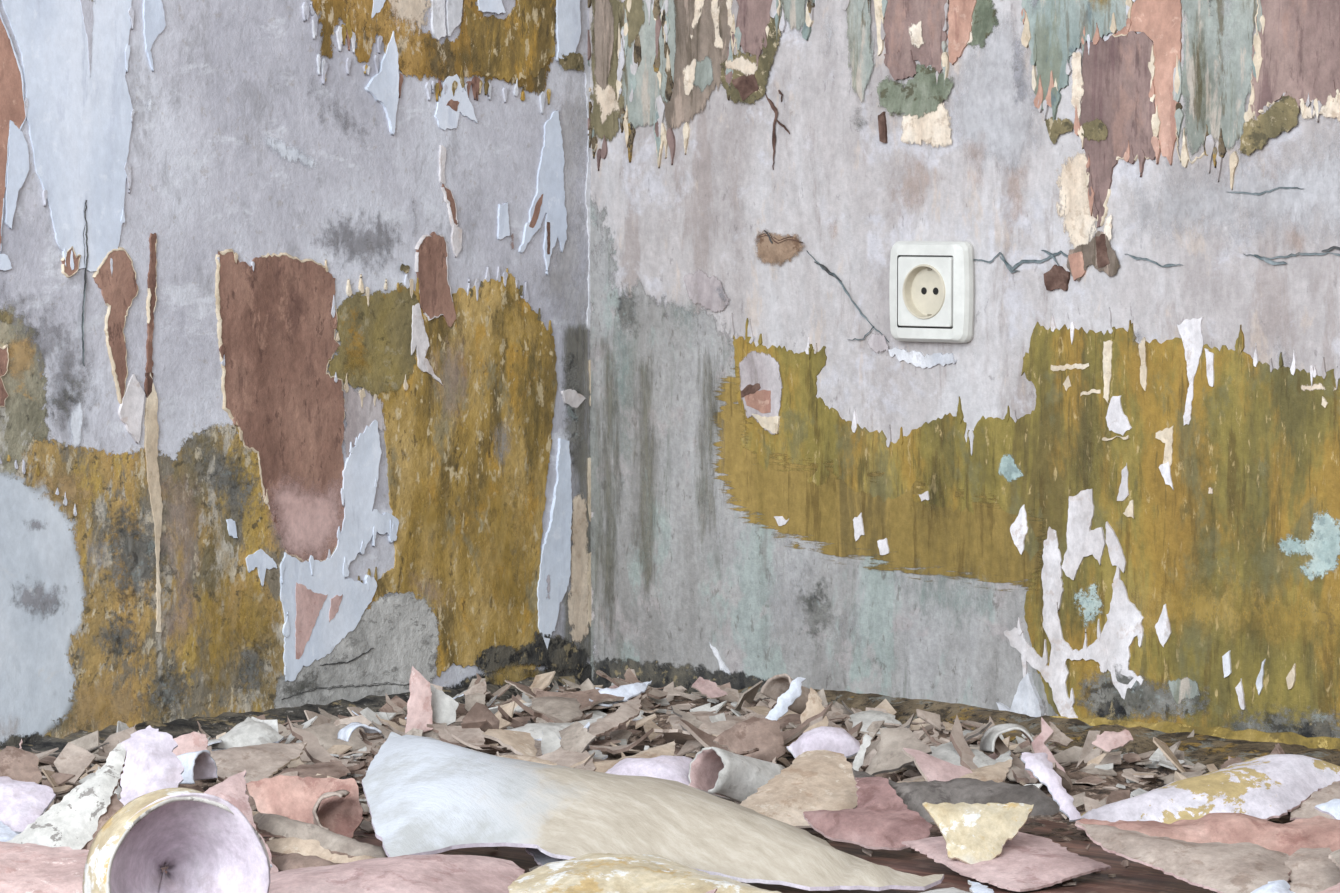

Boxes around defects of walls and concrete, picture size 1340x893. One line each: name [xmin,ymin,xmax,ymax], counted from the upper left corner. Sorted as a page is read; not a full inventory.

crack [973,250,1068,273]
peeling [1074,23,1161,228]
crack [1124,254,1181,267]
crack [1230,187,1304,195]
peeling [1244,0,1340,123]
crack [1244,246,1340,265]
peeling [215,249,385,587]
leakage [447,196,1056,716]
peeling [1062,489,1126,580]
peeling [1155,317,1214,490]
flaking render [0,455,127,893]
peeling [173,591,1340,893]